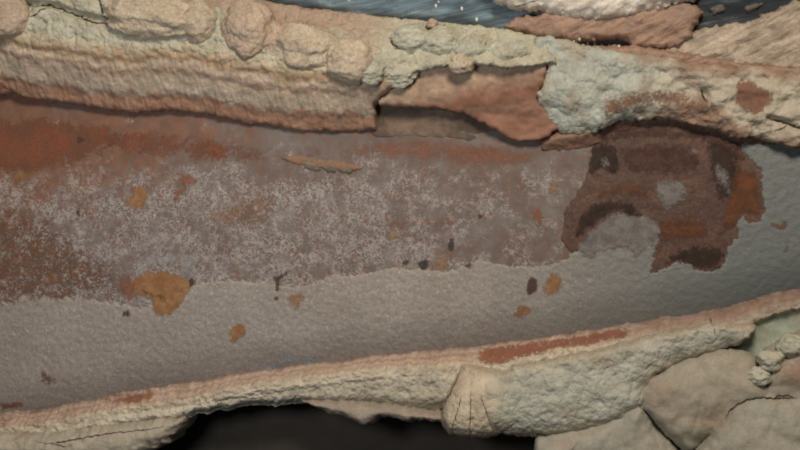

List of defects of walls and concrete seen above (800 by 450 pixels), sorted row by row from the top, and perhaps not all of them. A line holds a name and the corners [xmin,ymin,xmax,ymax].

spalling [371,103,497,141]
rust [0,211,112,305]
rust [122,271,190,315]
rust [230,324,245,343]
leakage [0,287,800,437]
rust [478,329,627,364]
crack [726,395,798,417]
crack [41,426,163,447]